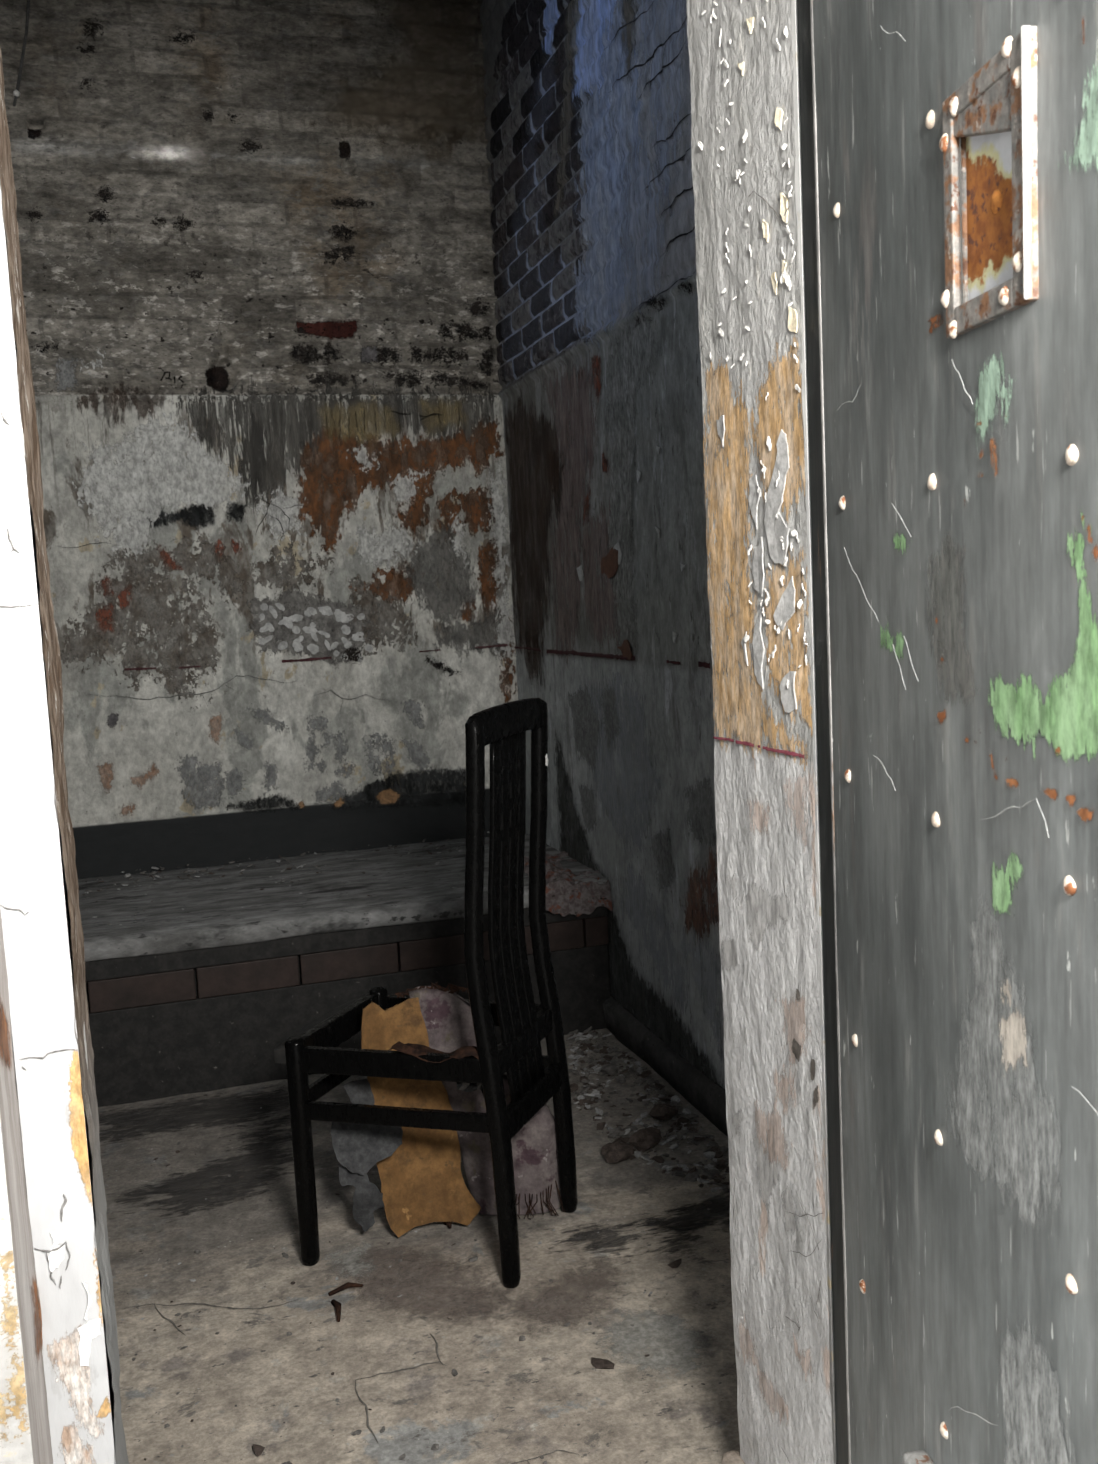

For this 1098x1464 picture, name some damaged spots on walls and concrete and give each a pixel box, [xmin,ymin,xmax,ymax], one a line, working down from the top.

damp [77,0,683,513]
flaking render [288,0,595,392]
crack [604,1,687,97]
crack [631,113,695,312]
peeling [698,1,748,184]
peeling [703,107,812,774]
peeling [60,409,462,750]
corrosion [292,397,591,703]
peeling [448,455,517,666]
peeling [96,751,279,816]
peeling [68,1051,93,1206]
peeling [47,1249,111,1464]